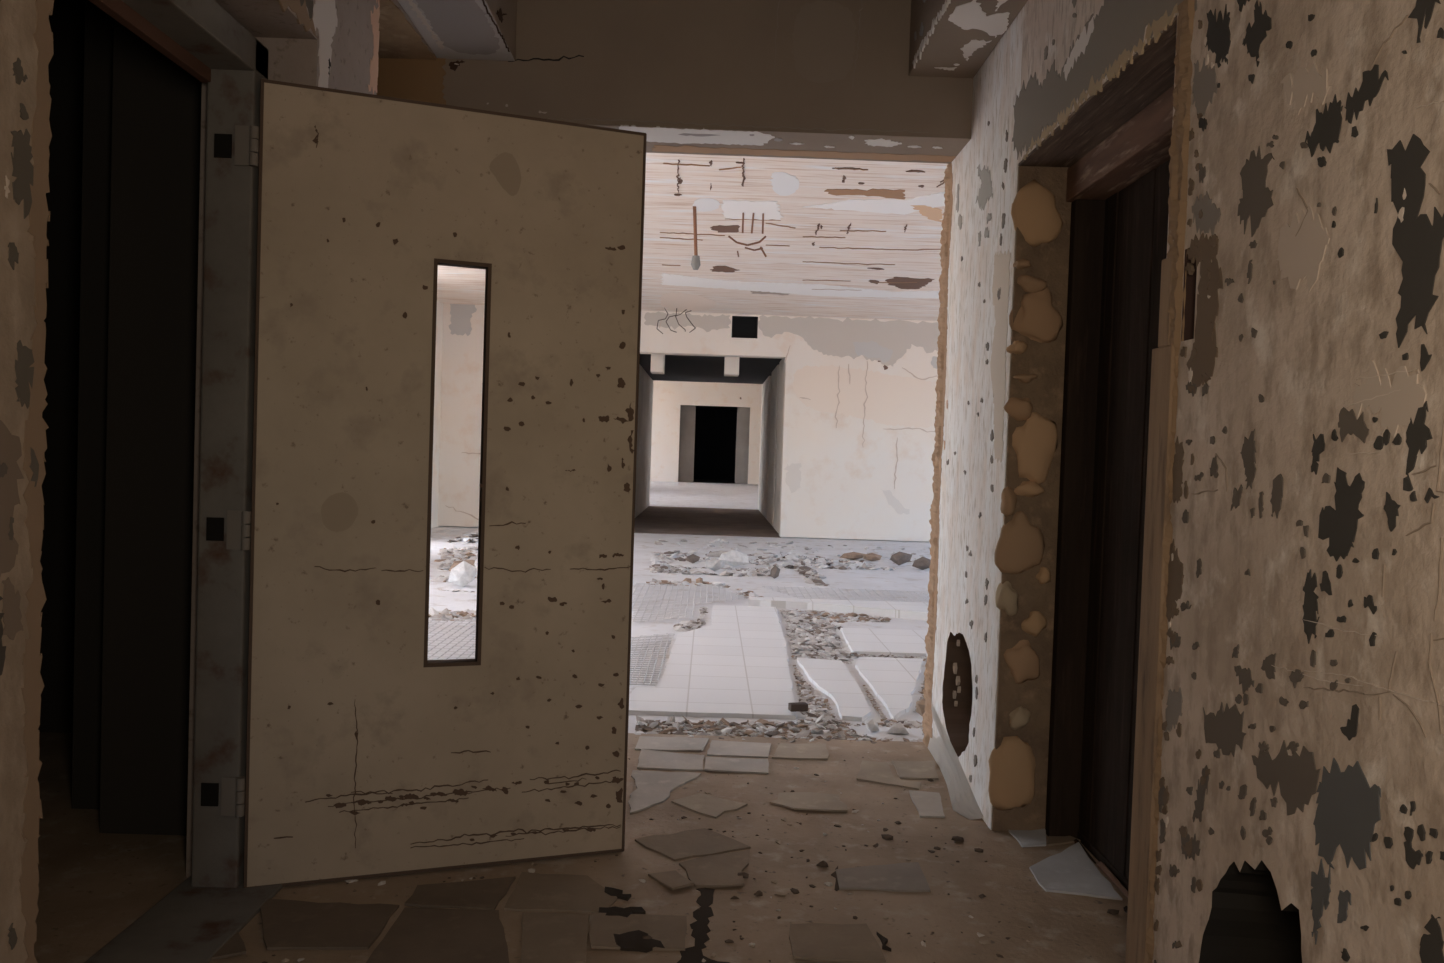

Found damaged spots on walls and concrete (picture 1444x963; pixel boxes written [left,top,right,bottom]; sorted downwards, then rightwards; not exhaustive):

spalling [0,0,54,963]
peeling [619,125,973,757]
peeling [912,0,1010,70]
spalling [965,0,1285,963]
spalling [1181,401,1444,963]
peeling [1300,64,1389,167]
peeling [1374,134,1444,371]
peeling [1402,0,1444,54]